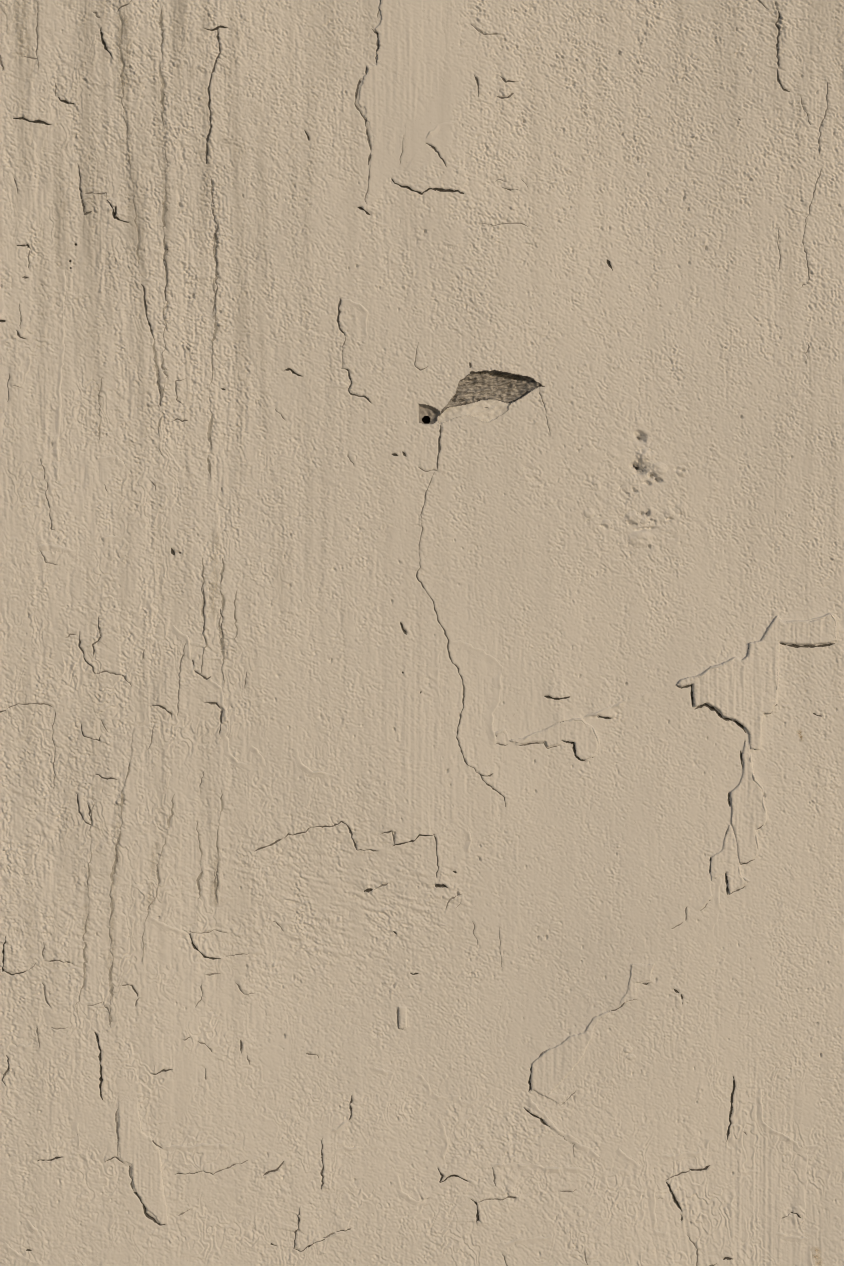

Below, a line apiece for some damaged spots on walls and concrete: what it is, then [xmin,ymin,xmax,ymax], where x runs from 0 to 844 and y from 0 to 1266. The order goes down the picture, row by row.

crack [93,0,132,58]
crack [78,165,129,223]
crack [205,25,228,317]
crack [0,244,30,339]
spalling [437,370,541,425]
crack [416,425,506,807]
peeling [495,718,600,761]
peeling [677,612,837,895]
crack [255,821,503,969]
crack [294,1096,353,1252]
crack [438,1167,516,1222]
crack [666,1076,817,1266]